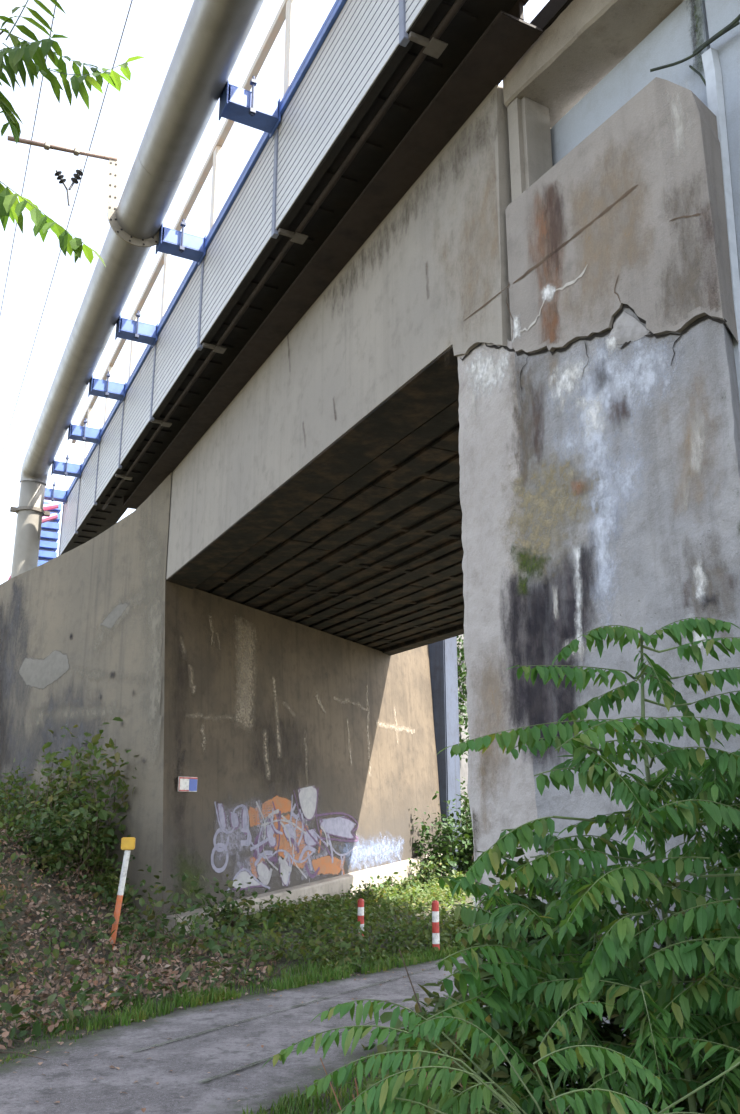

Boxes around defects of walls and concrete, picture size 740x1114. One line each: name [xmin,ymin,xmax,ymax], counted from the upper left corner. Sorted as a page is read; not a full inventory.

corrosion [533,187,562,342]
crack [460,275,727,402]
leakage [503,551,592,764]